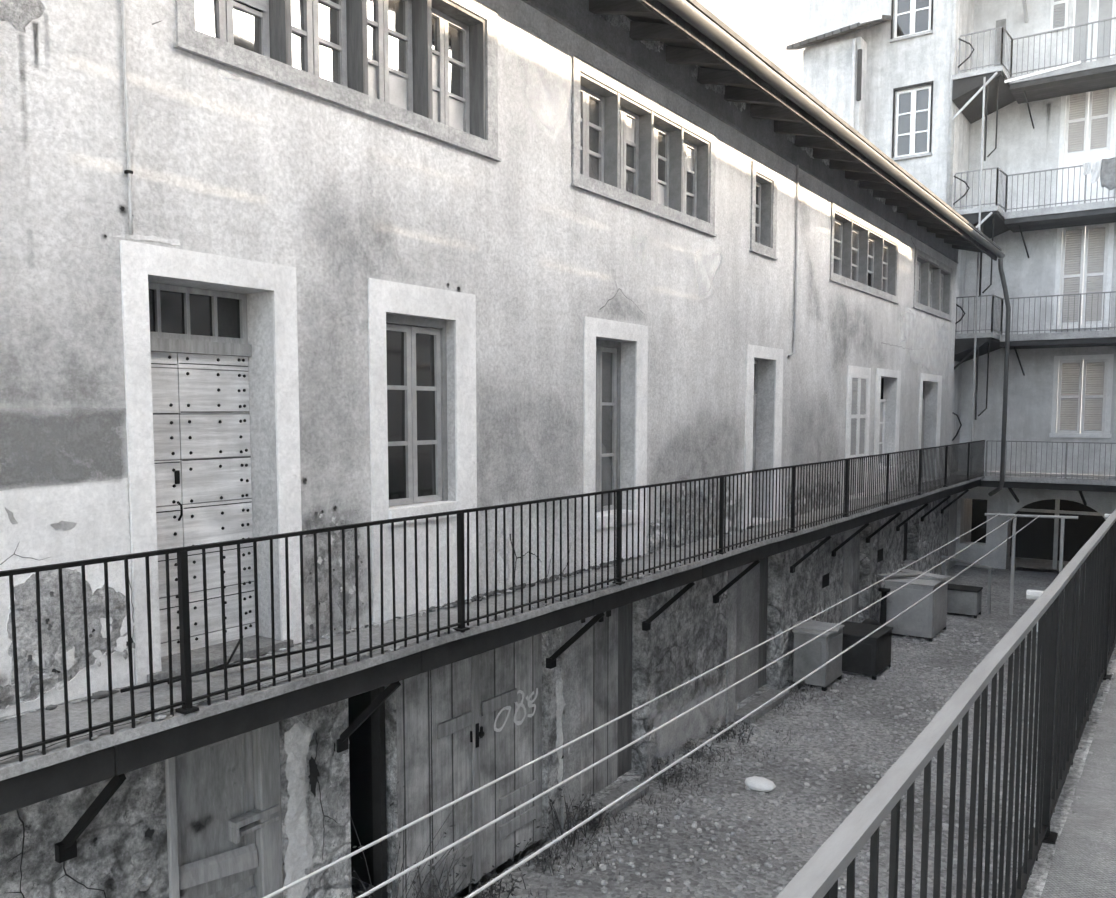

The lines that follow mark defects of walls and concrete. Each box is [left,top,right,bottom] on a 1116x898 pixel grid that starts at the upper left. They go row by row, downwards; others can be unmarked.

spalling [0,0,46,55]
spalling [0,568,135,710]
spalling [331,721,349,760]
spalling [284,721,341,898]
crack [6,810,25,898]
crack [57,861,106,898]